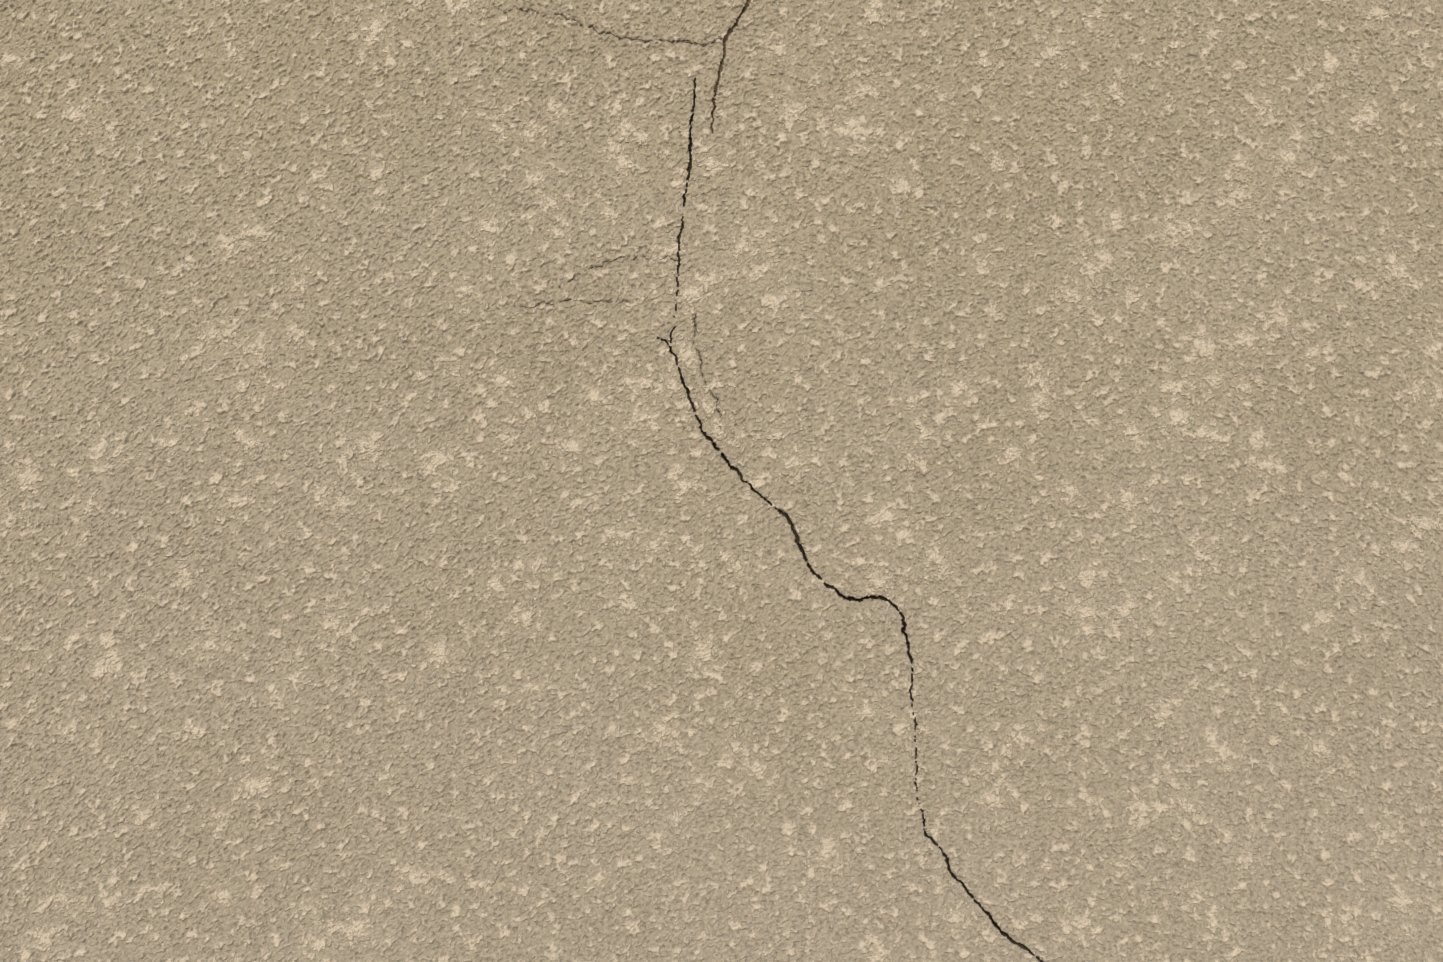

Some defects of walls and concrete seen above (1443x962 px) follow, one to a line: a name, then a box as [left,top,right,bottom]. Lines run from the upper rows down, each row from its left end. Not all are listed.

crack [497,0,1043,962]